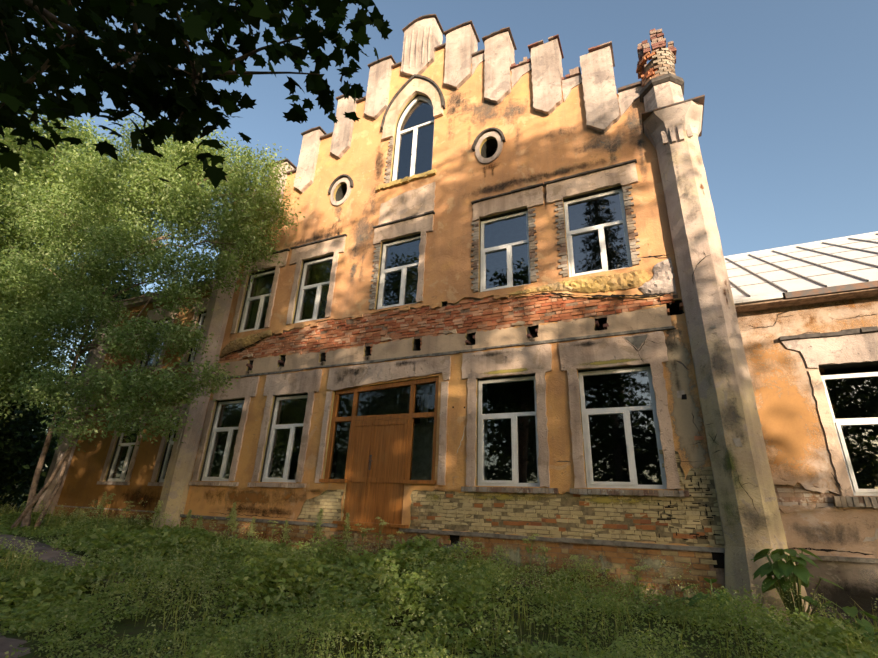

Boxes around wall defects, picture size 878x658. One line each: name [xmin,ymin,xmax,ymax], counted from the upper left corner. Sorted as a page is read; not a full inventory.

water stain [472,132,638,222]
flaking render [528,208,539,283]
flaking render [555,201,568,277]
spalling [220,221,678,362]
peeling [409,329,725,548]
peeling [746,344,839,513]
water stain [817,583,878,619]